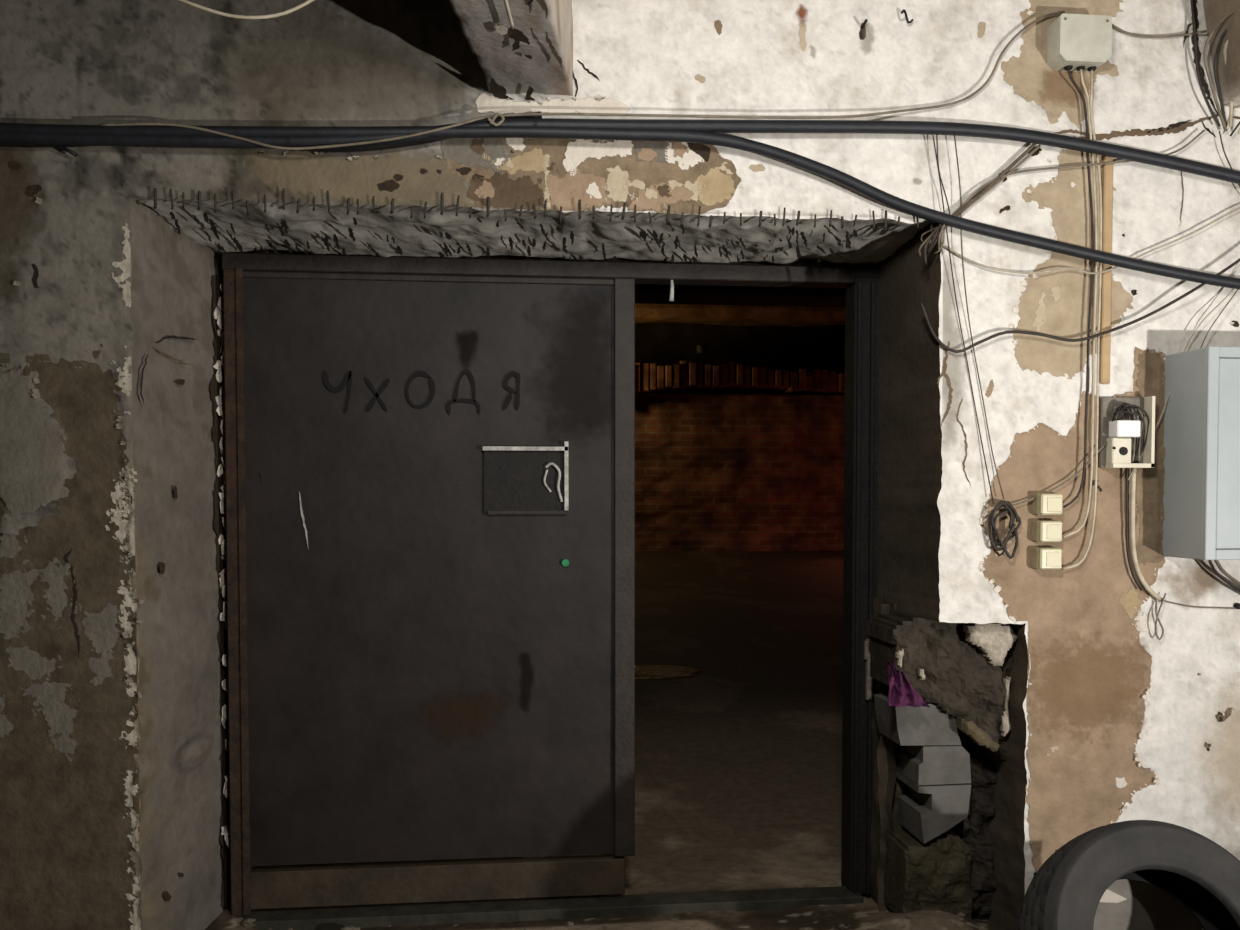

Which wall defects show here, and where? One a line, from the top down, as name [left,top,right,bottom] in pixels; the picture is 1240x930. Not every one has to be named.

peeling [1001,0,1124,132]
crack [1055,0,1240,140]
peeling [153,138,858,267]
spalling [872,210,900,231]
peeling [1009,146,1139,379]
peeling [0,344,144,930]
peeling [979,347,1166,872]